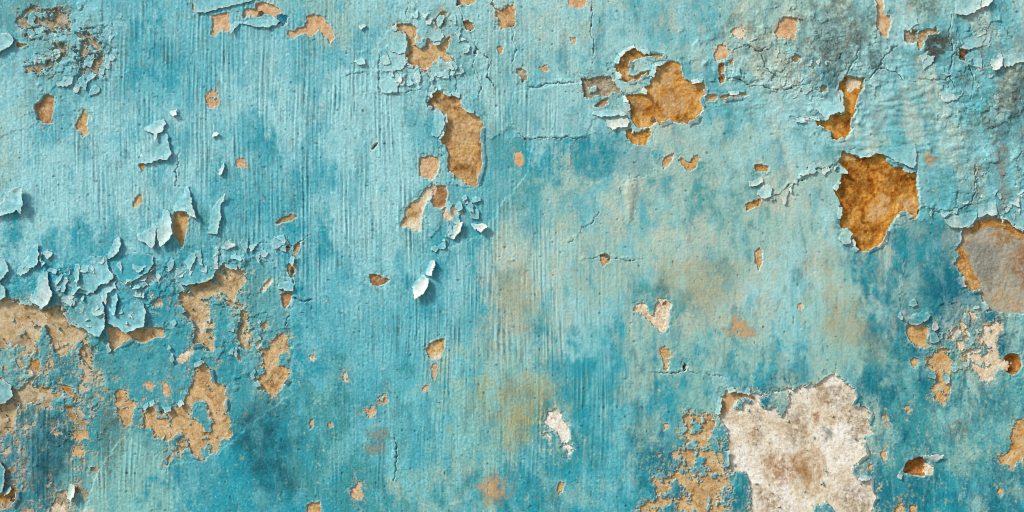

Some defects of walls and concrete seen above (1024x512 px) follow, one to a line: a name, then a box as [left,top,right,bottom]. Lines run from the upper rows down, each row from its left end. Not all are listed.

peeling [0,5,116,123]
peeling [379,0,488,299]
peeling [582,17,798,145]
peeling [746,55,1024,405]
peeling [0,186,300,512]
flaking render [633,298,672,332]
flaking render [544,408,571,454]
flaking render [635,374,888,512]